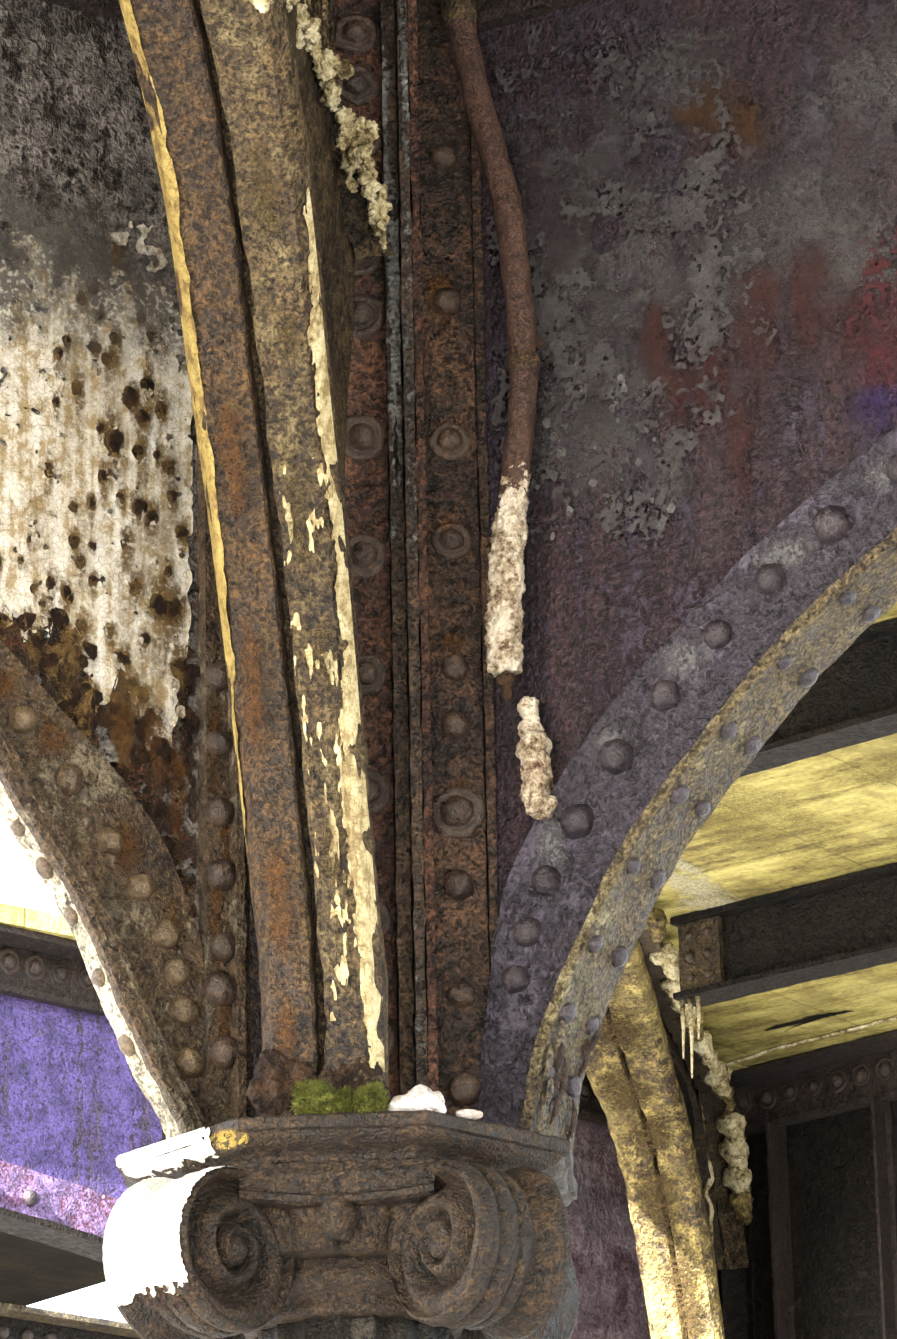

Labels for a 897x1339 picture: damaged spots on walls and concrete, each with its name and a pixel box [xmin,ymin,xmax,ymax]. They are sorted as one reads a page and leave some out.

damp [249,0,393,253]
corrosion [0,267,189,867]
peeling [0,0,248,849]
peeling [279,187,385,1072]
efflorescence [484,462,558,820]
peeling [103,1127,248,1311]
corrosion [245,1048,390,1117]
corrosion [596,1073,702,1339]
efflorescence [643,858,897,1245]